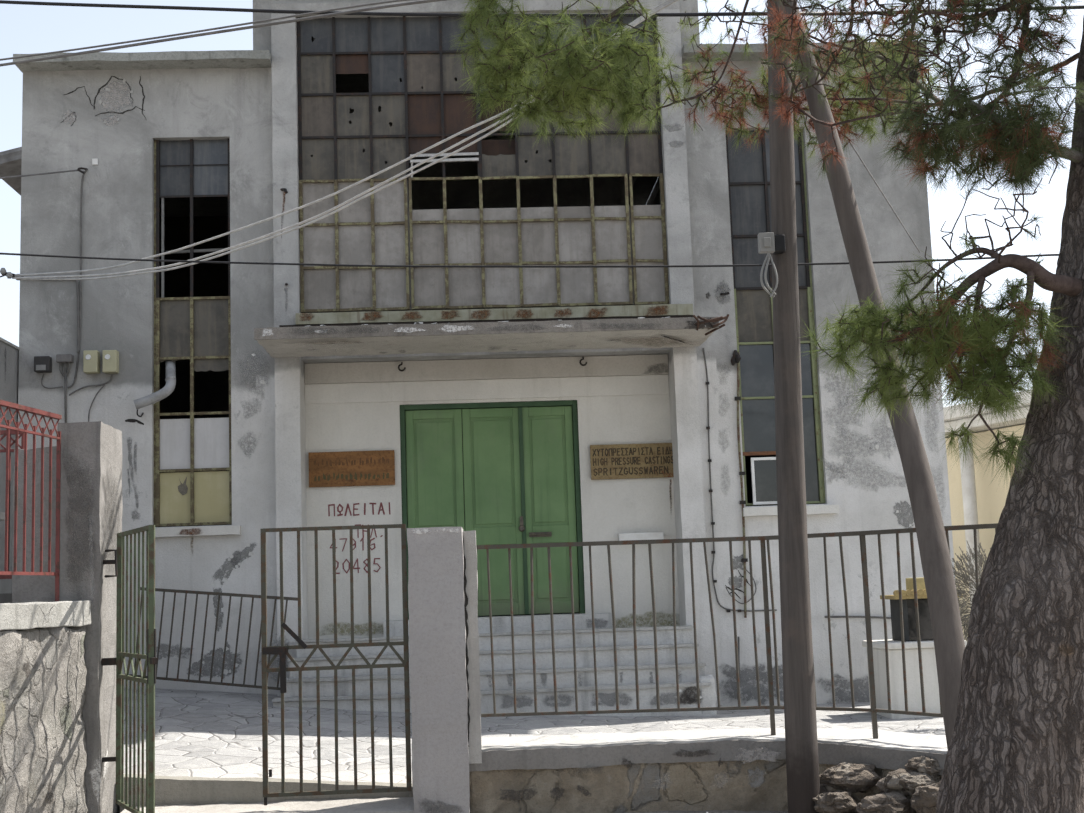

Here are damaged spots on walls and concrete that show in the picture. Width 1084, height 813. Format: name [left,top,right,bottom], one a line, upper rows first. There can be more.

crack [61,76,146,126]
peeling [211,543,256,631]
peeling [187,643,242,680]